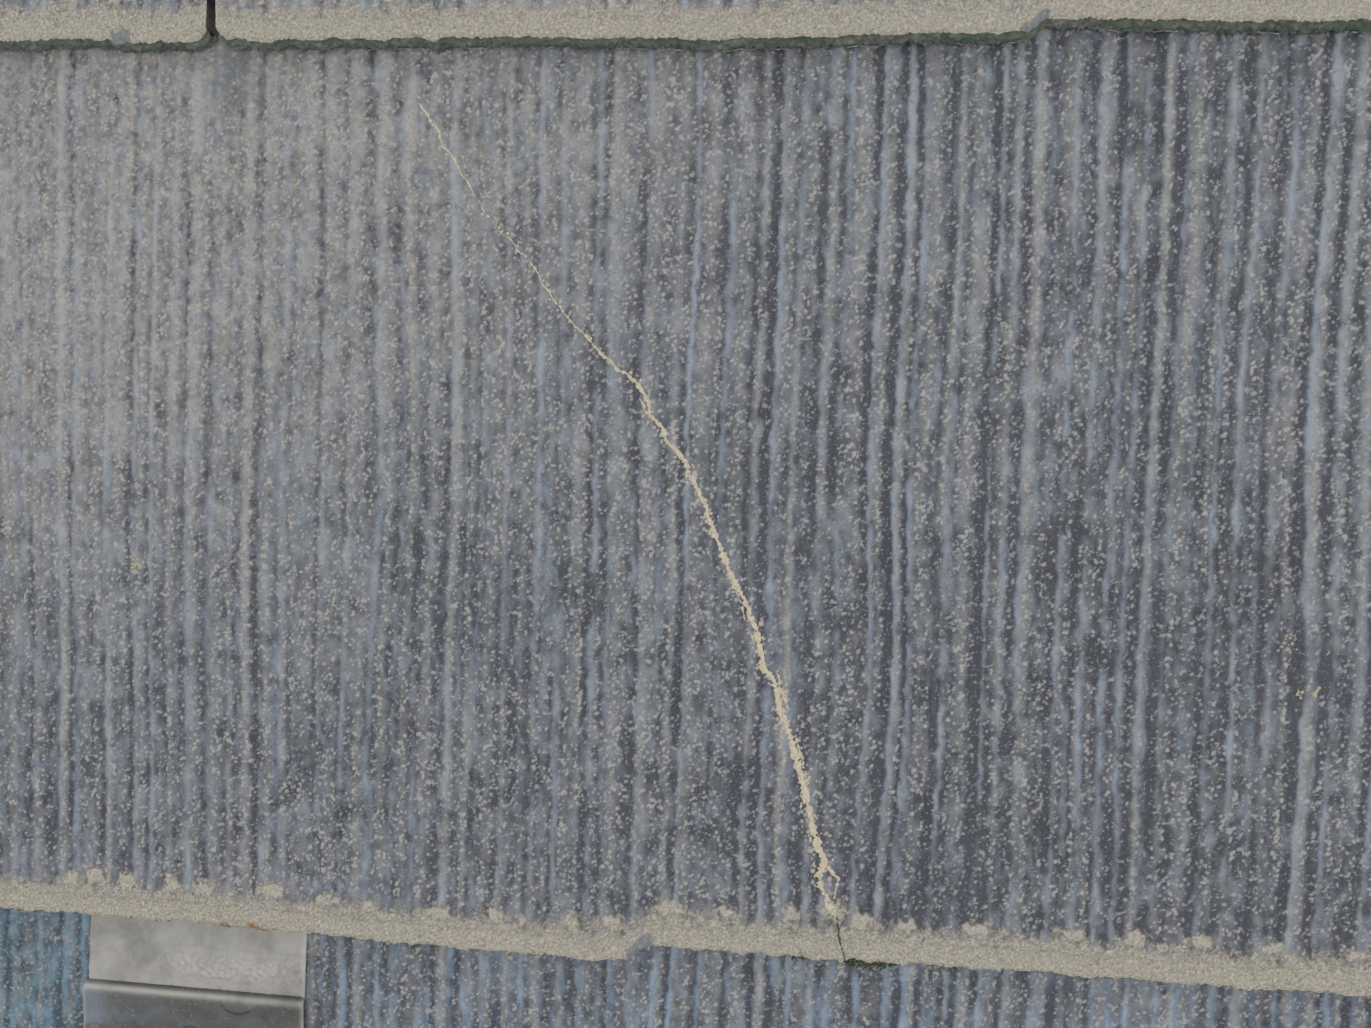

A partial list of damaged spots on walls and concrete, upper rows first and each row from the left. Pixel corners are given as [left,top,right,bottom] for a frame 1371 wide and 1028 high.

crack [418,102,845,961]